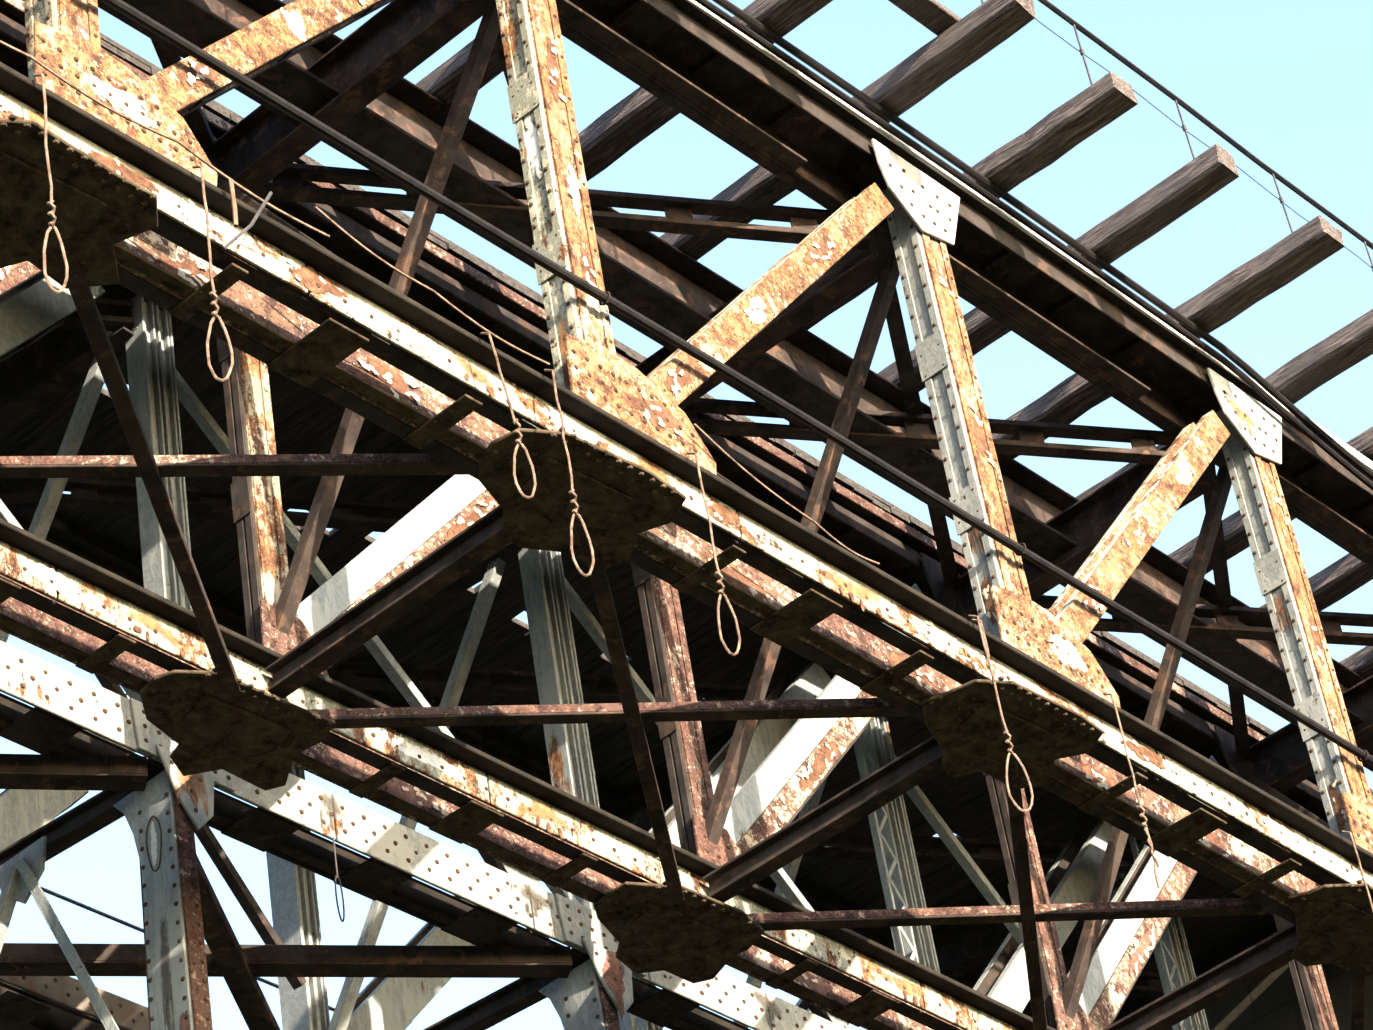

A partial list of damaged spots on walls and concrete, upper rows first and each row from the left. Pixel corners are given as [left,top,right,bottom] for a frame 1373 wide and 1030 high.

rust [176,59,220,91]
peeling [83,73,157,127]
rust [559,317,570,390]
peeling [538,405,596,443]
rust [981,577,997,623]
rust [1081,585,1105,619]
rust [130,610,189,658]
rust [888,652,941,695]
peeling [1048,634,1087,672]
rust [384,781,440,811]
rust [521,801,566,839]
rust [1329,779,1346,832]